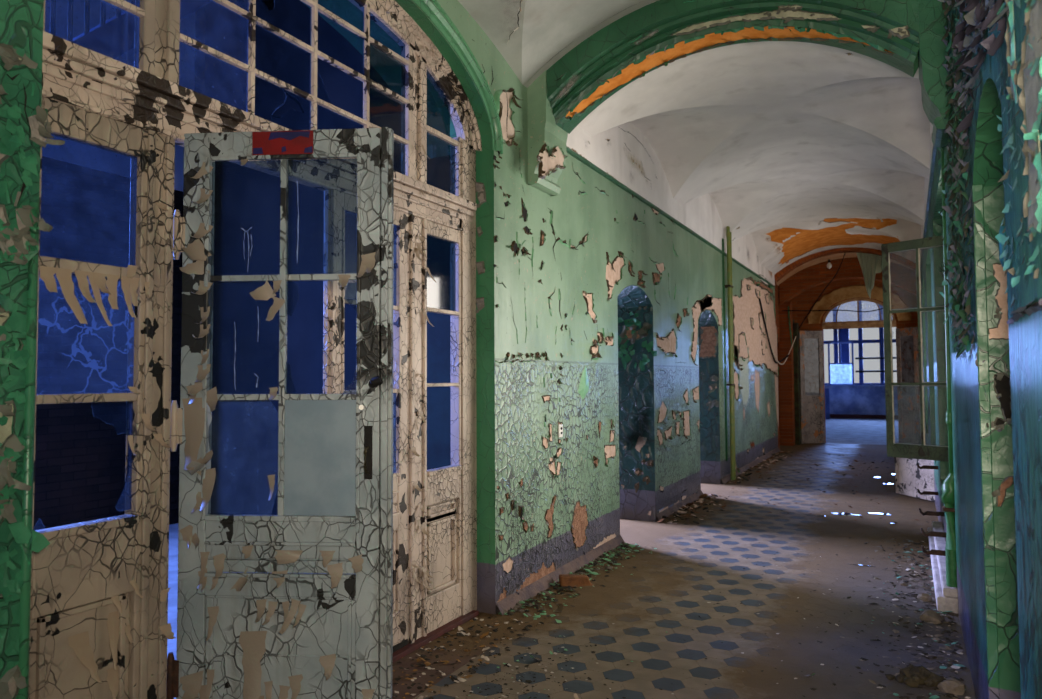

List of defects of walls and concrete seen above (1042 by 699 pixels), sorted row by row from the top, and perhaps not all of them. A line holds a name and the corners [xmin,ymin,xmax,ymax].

peeling [493,88,522,169]
peeling [475,182,546,257]
peeling [537,143,592,179]
peeling [936,0,1042,366]
peeling [606,251,665,300]
peeling [0,84,65,603]
peeling [506,351,564,384]
peeling [582,290,723,371]
peeling [586,375,719,493]
peeling [986,372,1012,432]
spalling [497,478,557,538]
spalling [571,501,617,555]